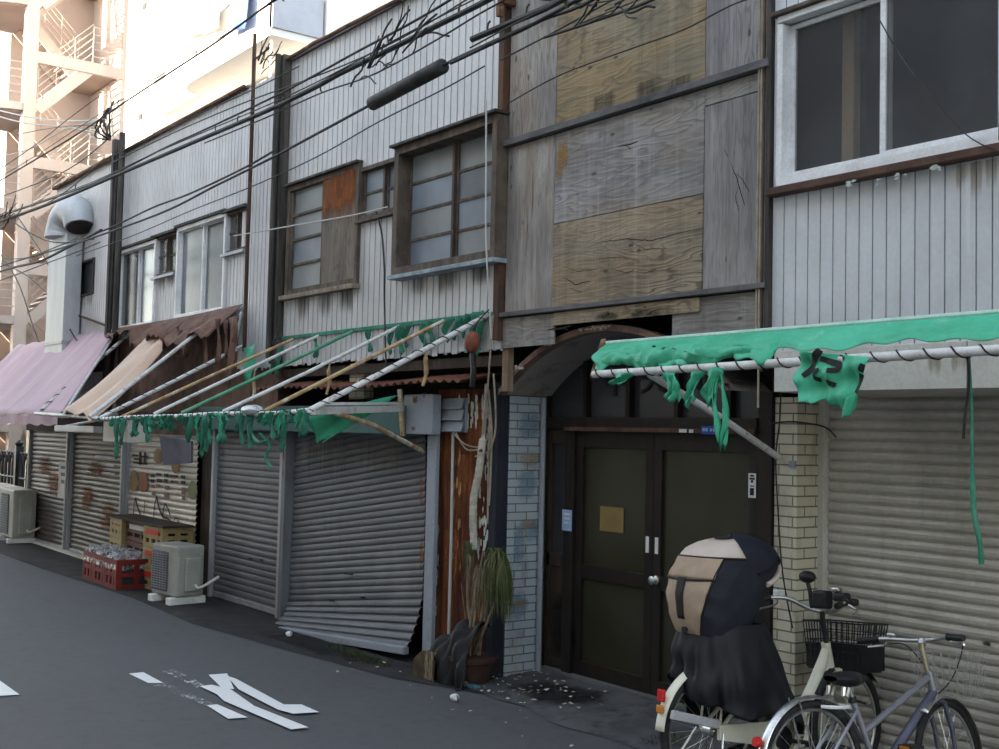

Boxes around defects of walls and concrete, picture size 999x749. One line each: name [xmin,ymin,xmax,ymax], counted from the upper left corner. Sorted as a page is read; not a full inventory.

crack [725,151,749,211]
corrosion [442,401,483,517]
corrosion [444,529,458,583]